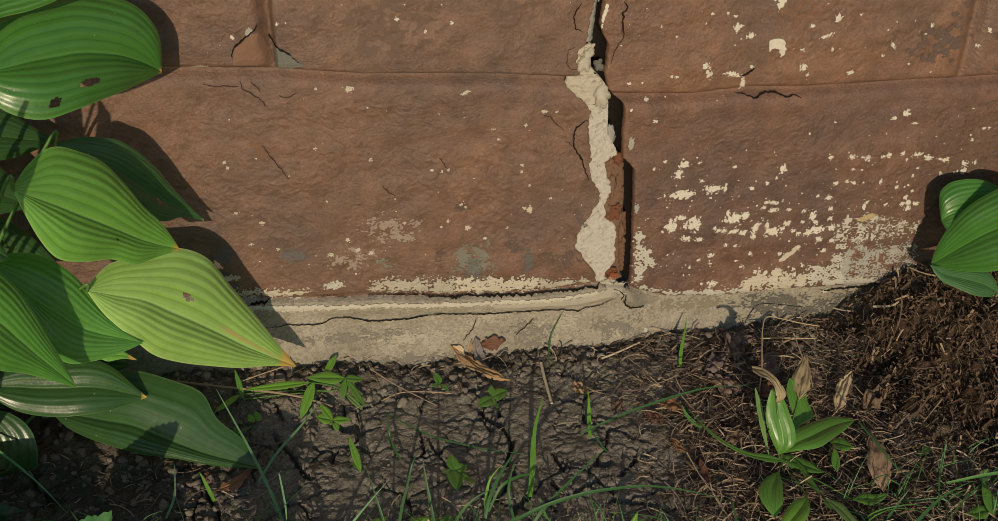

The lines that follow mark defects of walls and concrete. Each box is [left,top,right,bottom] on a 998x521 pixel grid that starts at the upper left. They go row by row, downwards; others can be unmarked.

crack [247,0,644,341]
spalling [368,0,838,297]
crack [737,68,801,99]
peeling [833,151,976,211]